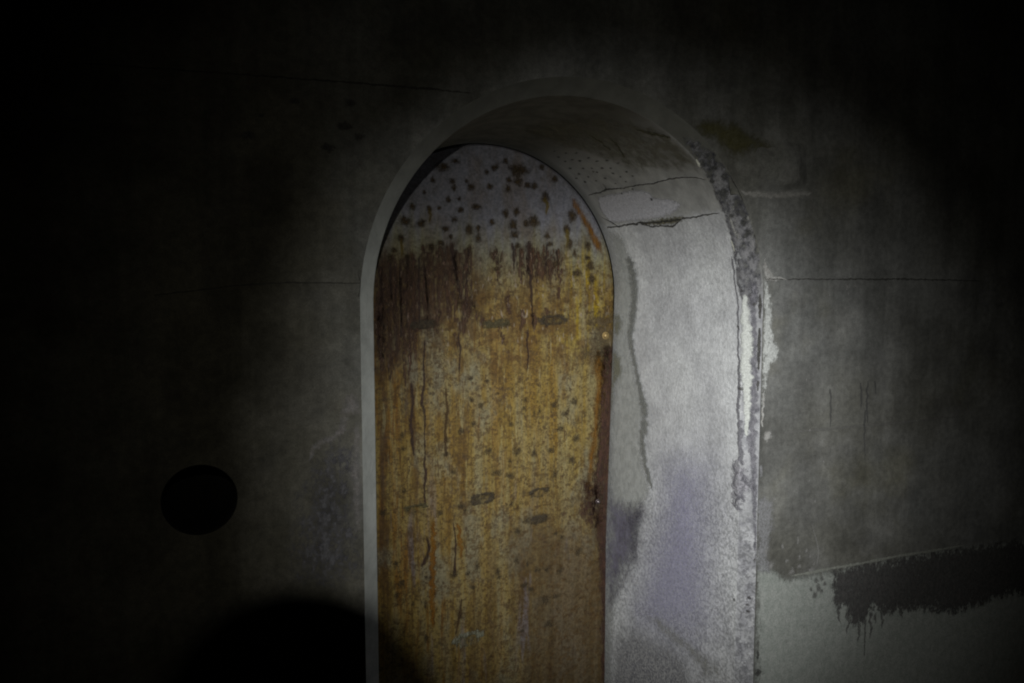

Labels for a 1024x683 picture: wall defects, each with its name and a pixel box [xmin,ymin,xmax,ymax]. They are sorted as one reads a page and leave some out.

crack [589,177,704,195]
crack [604,213,719,228]
rust [374,158,601,504]
rust [580,307,621,680]
rust [412,511,443,642]
leakage [755,541,1024,683]